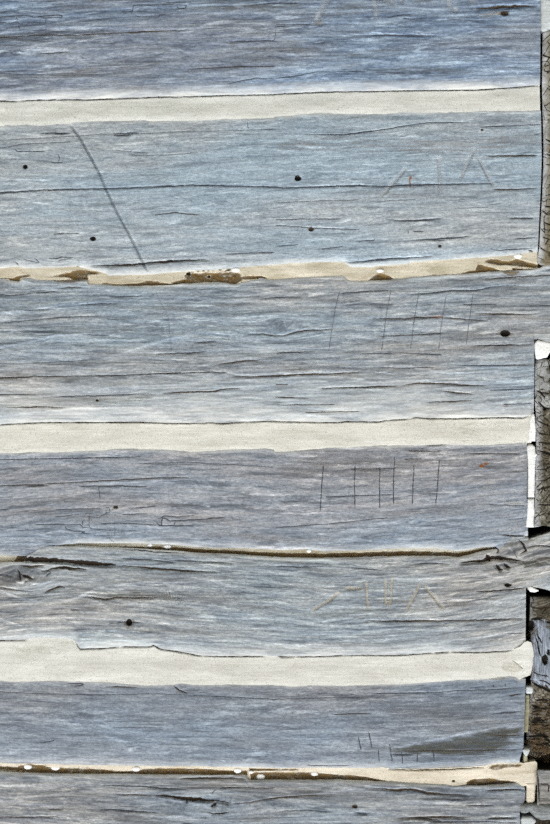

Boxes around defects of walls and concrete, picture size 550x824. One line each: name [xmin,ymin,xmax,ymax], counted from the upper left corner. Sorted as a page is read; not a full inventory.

spalling [462,259,541,274]
spalling [59,270,98,280]
spalling [103,272,265,286]